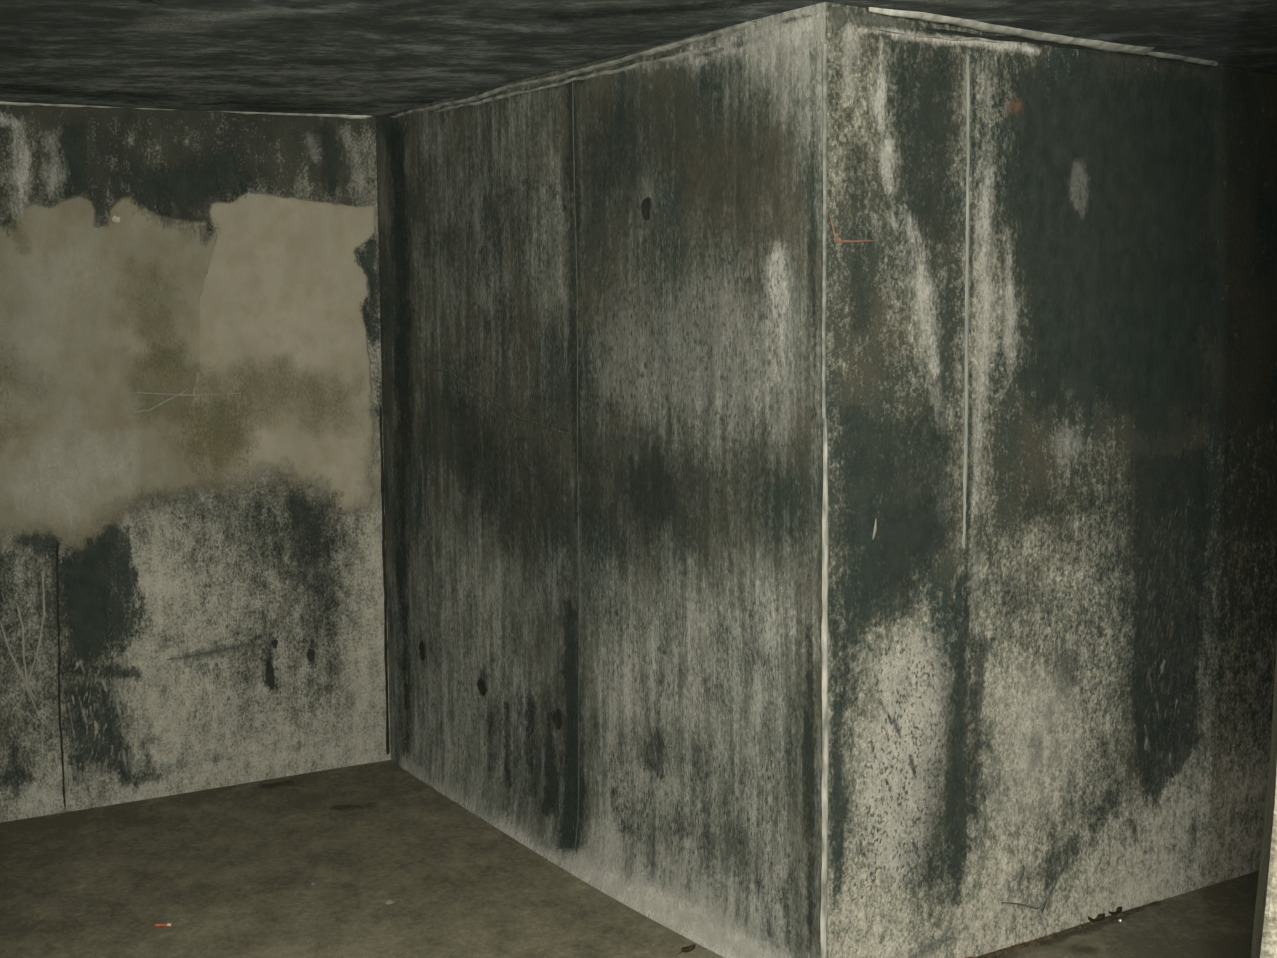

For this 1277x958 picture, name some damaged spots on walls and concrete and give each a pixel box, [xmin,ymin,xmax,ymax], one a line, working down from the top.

damp [0,113,91,227]
damp [356,236,379,343]
damp [637,3,823,69]
damp [872,42,958,378]
damp [971,54,1223,517]
damp [17,525,145,682]
damp [387,122,816,958]
damp [831,407,954,892]
damp [921,574,987,902]